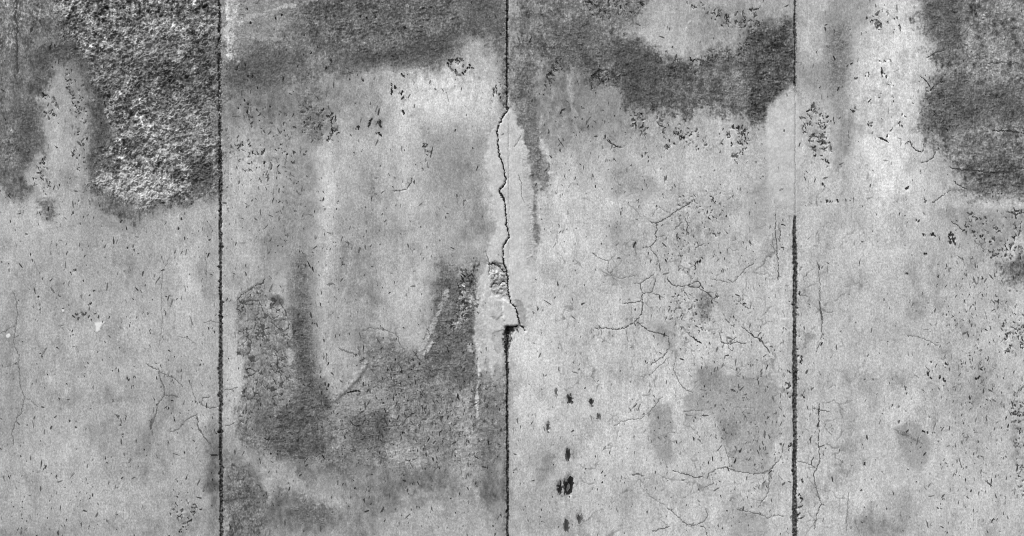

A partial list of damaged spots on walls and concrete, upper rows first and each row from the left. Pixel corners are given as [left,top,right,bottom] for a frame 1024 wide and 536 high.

damp [0,0,233,234]
spalling [0,0,626,536]
crack [486,109,525,353]
damp [209,0,875,536]
crack [592,88,796,412]
damp [899,0,1024,293]
crack [632,403,849,535]